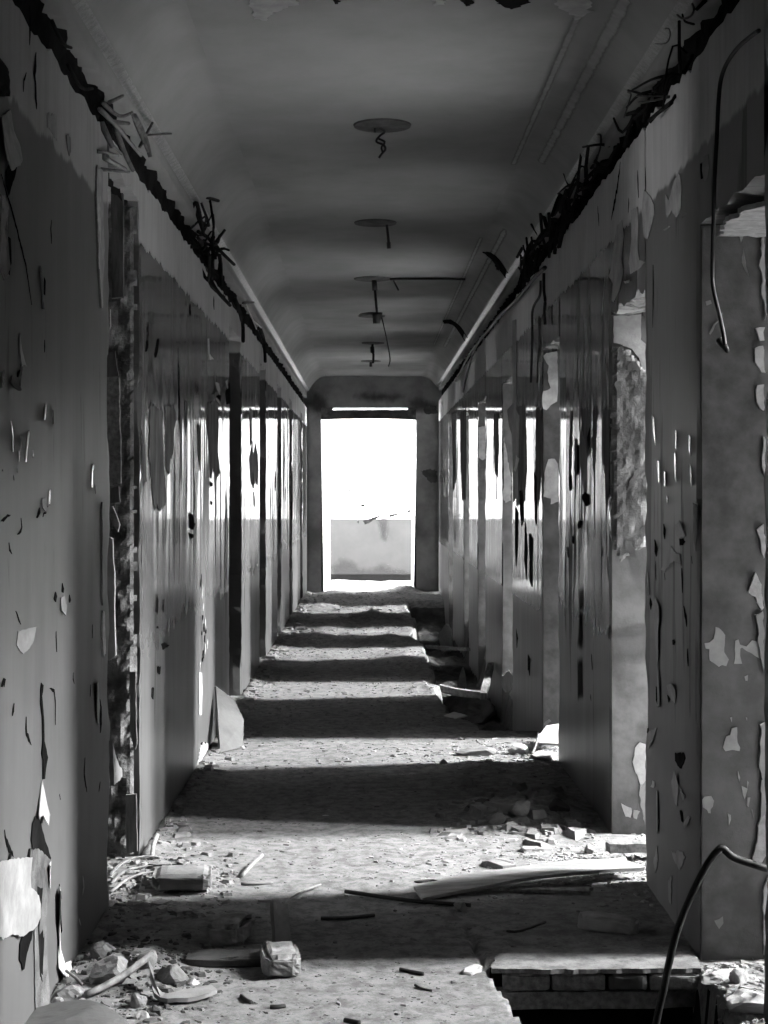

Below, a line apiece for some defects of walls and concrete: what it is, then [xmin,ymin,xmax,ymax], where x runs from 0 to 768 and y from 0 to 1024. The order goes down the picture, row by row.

spalling [495,0,531,9]
spalling [717,201,767,411]
peeling [249,408,259,489]
spalling [91,165,230,859]
spalling [452,314,698,707]
spalling [756,524,766,558]
peeling [16,612,37,654]
spalling [705,572,765,681]
peeling [0,683,72,1010]
spalling [622,728,657,822]
spalling [738,722,766,863]
spalling [752,876,768,961]